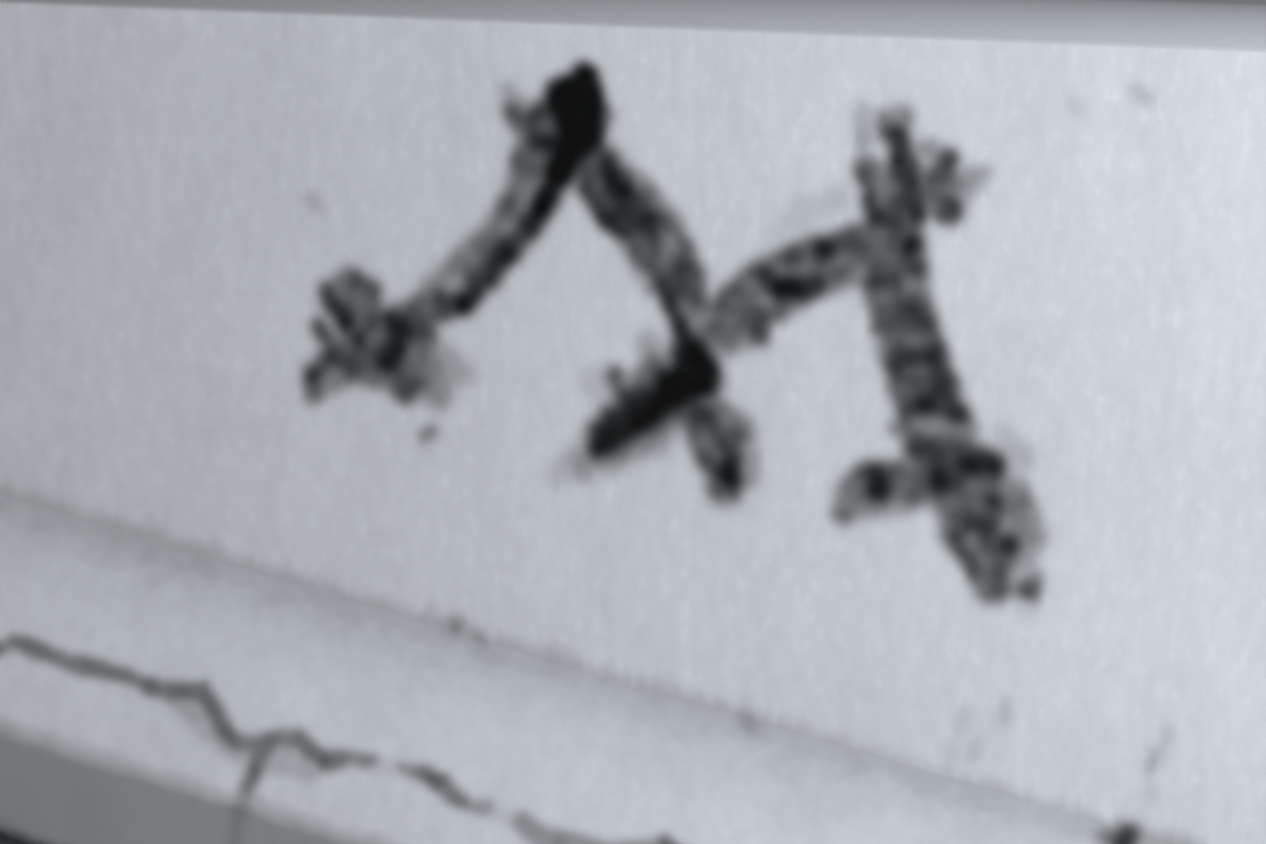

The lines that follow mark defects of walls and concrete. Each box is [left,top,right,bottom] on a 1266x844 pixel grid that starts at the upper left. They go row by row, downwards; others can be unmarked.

crack [319,755,332,765]
crack [427,774,444,786]